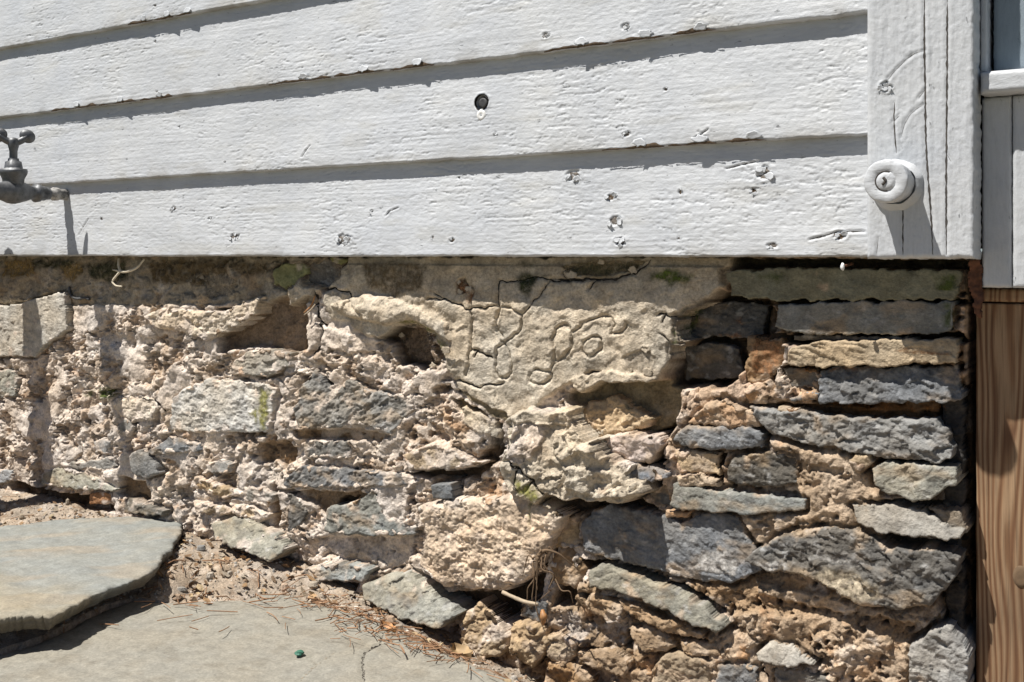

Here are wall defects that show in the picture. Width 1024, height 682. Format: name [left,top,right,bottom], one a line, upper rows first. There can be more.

peeling [602,130,763,151]
peeling [749,166,774,195]
peeling [334,236,350,246]
peeling [607,216,625,247]
crack [429,260,651,311]